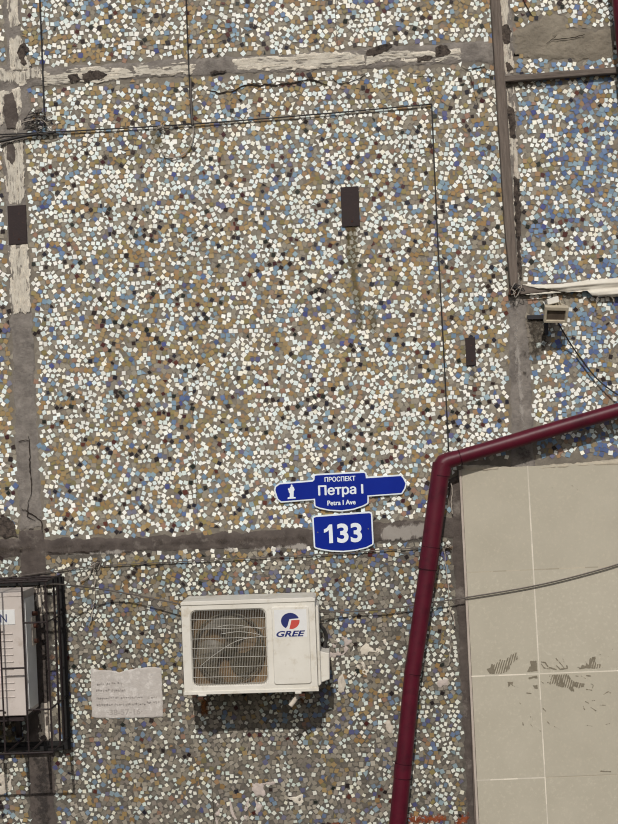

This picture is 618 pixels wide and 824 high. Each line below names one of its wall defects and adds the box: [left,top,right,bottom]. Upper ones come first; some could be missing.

peeling [232,43,461,71]
crack [206,73,368,94]